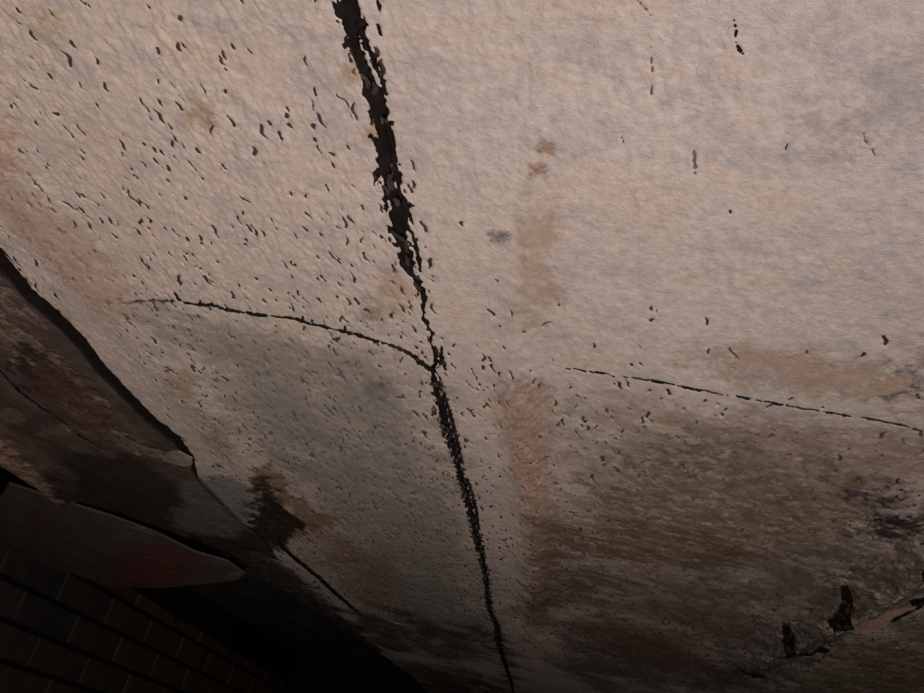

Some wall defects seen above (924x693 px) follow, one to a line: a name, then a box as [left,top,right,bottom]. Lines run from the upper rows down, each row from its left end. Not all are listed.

crack [648,46,656,95]
crack [733,19,744,55]
crack [691,150,699,175]
crack [106,0,515,693]
crack [565,368,923,436]
leakage [45,329,524,693]
leakage [513,397,924,693]
spalling [724,526,924,679]